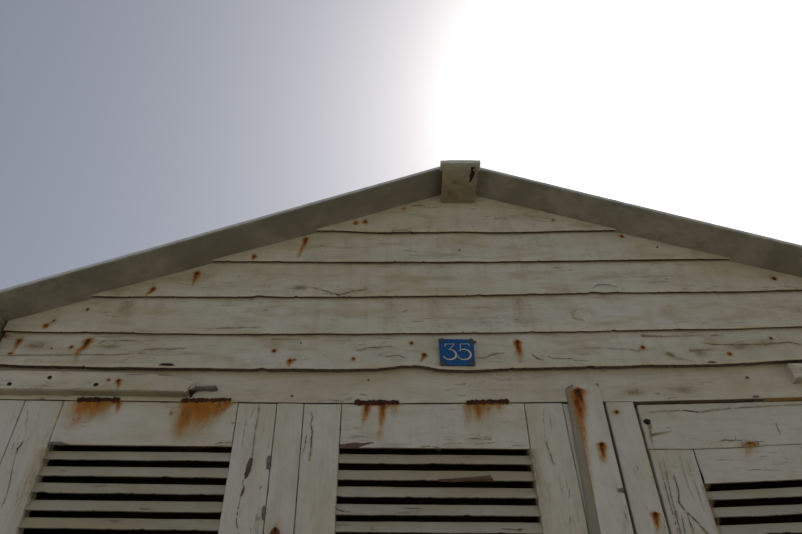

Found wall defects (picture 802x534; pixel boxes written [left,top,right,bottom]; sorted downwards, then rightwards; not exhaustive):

rust [170,401,231,433]
rust [571,387,587,447]
rust [598,442,607,461]
crack [660,459,708,534]